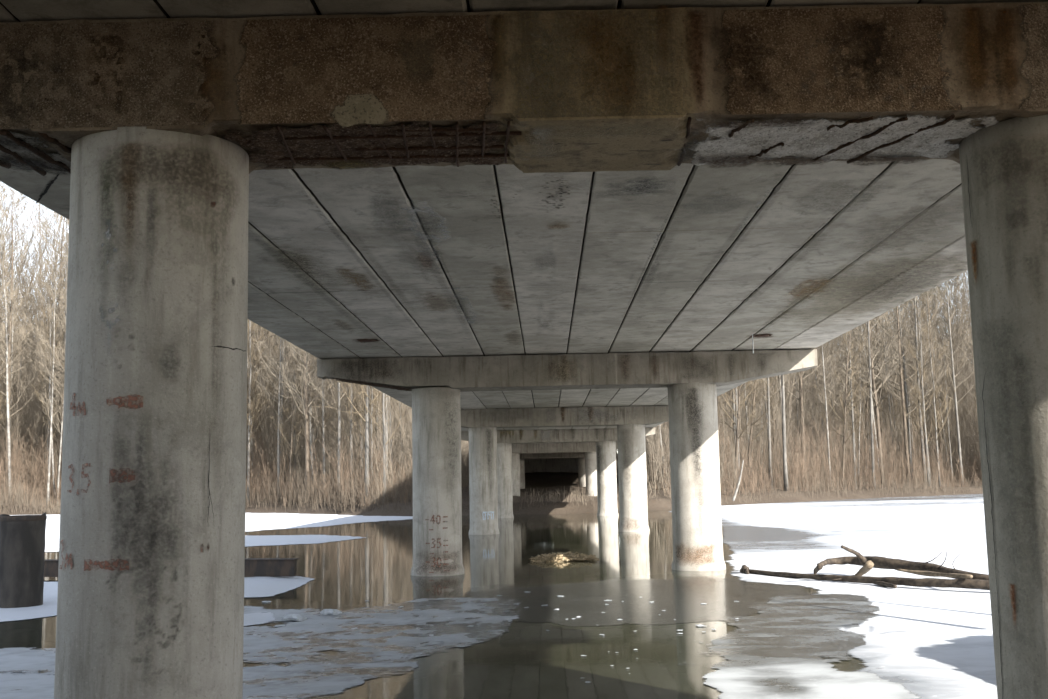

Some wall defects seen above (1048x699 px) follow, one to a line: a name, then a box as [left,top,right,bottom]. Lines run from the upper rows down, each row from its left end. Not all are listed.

peeling [0,20,220,176]
peeling [222,14,535,170]